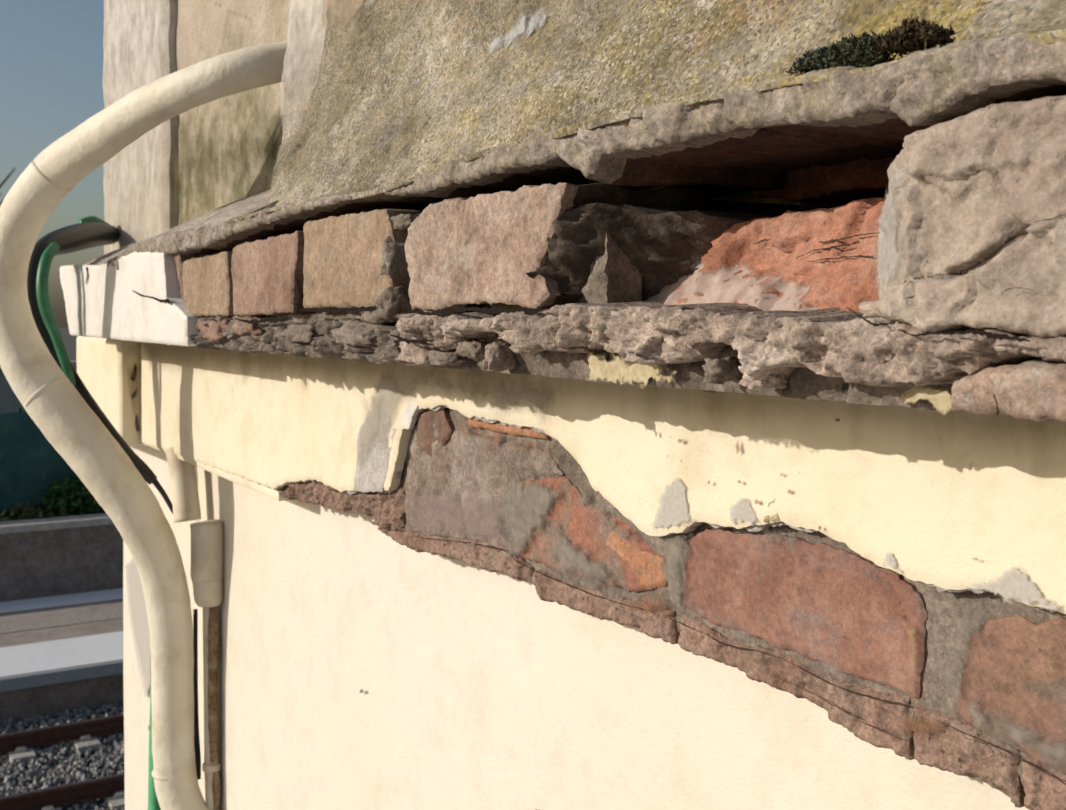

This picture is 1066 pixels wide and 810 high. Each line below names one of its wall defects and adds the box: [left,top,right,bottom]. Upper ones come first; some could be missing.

spalling [645,157,895,318]
crack [797,232,880,262]
crack [903,214,1066,284]
crack [132,290,170,304]
spalling [174,254,195,301]
spalling [284,213,420,347]
spalling [198,316,270,343]
crack [847,307,1030,342]
spalling [397,331,604,372]
spalling [702,356,788,390]
spalling [280,401,1066,810]